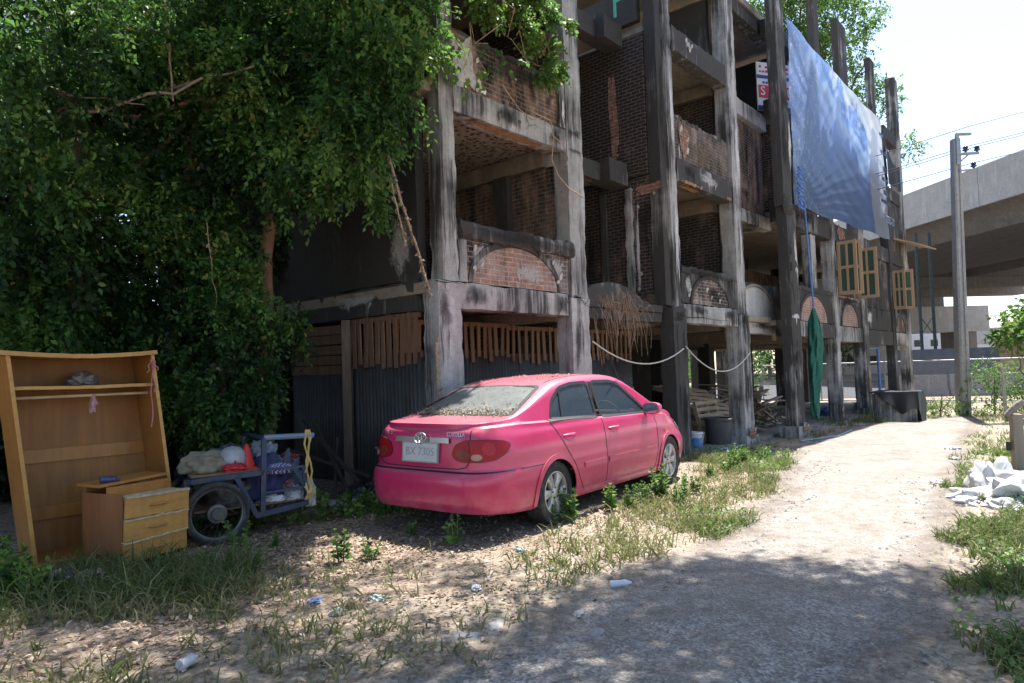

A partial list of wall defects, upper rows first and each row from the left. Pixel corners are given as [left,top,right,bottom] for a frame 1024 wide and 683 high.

spalling [678,121,689,161]
leakage [440,296,450,361]